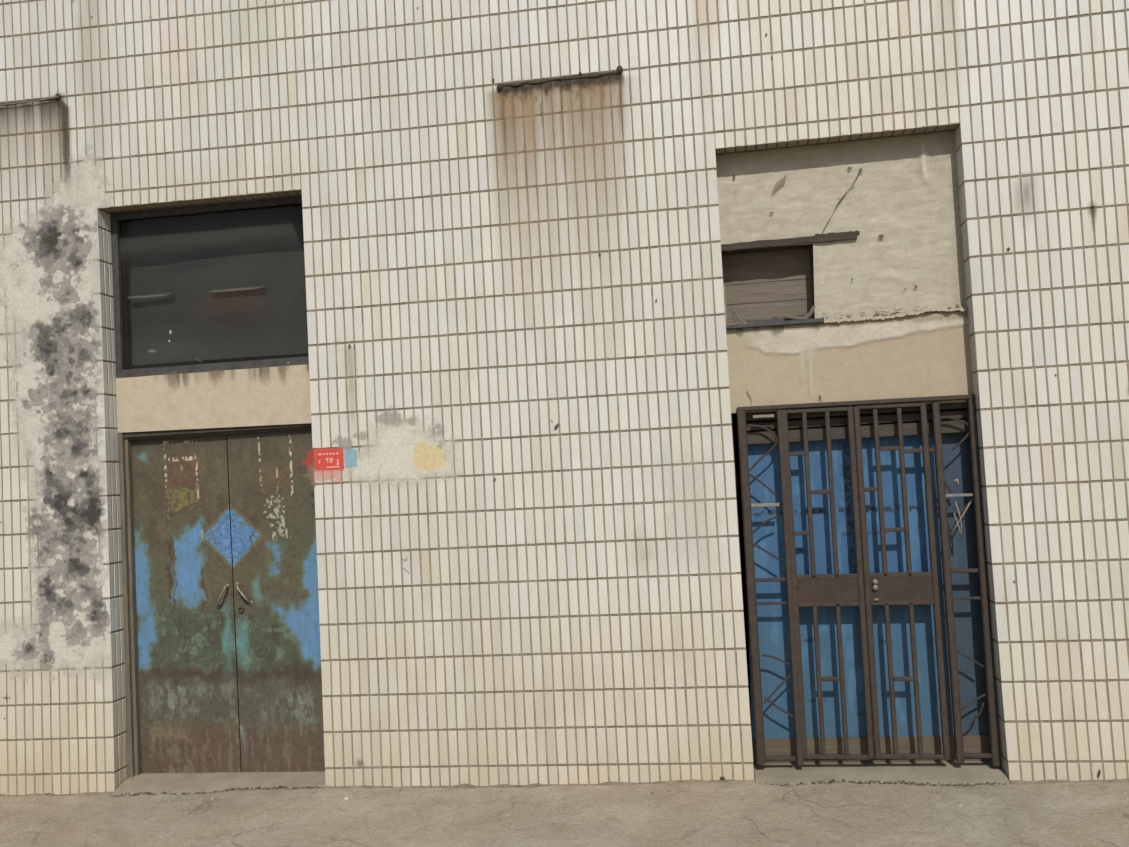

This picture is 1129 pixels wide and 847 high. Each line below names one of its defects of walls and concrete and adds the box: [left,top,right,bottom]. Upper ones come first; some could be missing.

damp [0,98,111,680]
corrosion [494,74,622,155]